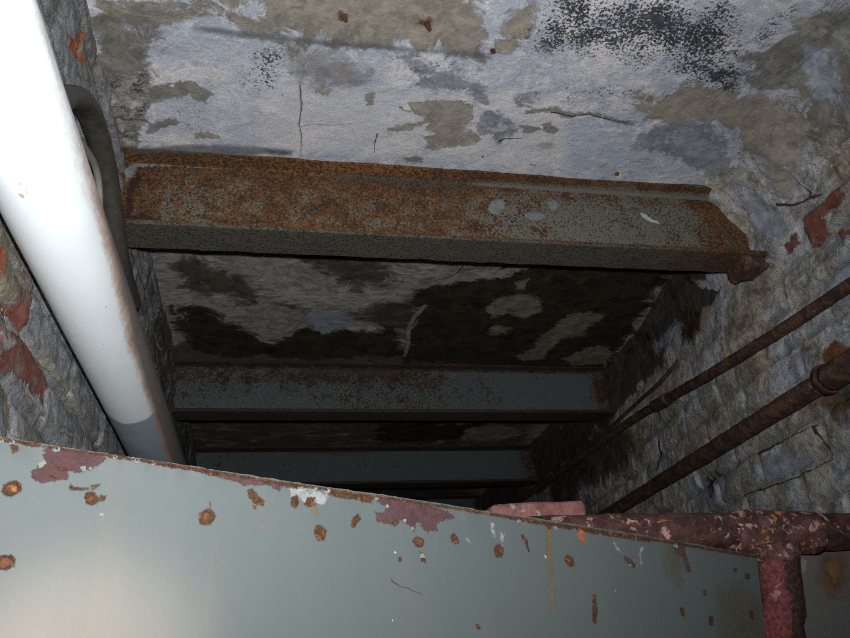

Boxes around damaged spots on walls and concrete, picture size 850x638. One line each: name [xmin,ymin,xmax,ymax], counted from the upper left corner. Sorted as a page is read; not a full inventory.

mould [525,0,746,93]
crack [296,83,304,146]
crack [526,106,638,125]
flaking render [780,186,850,255]
damp [168,251,257,306]
flaking render [0,247,47,435]
damp [169,264,692,367]
corrosion [681,308,703,344]
corrosion [823,341,848,362]
peeling [31,448,106,483]
corrosion [0,437,758,609]
peeling [373,497,454,533]